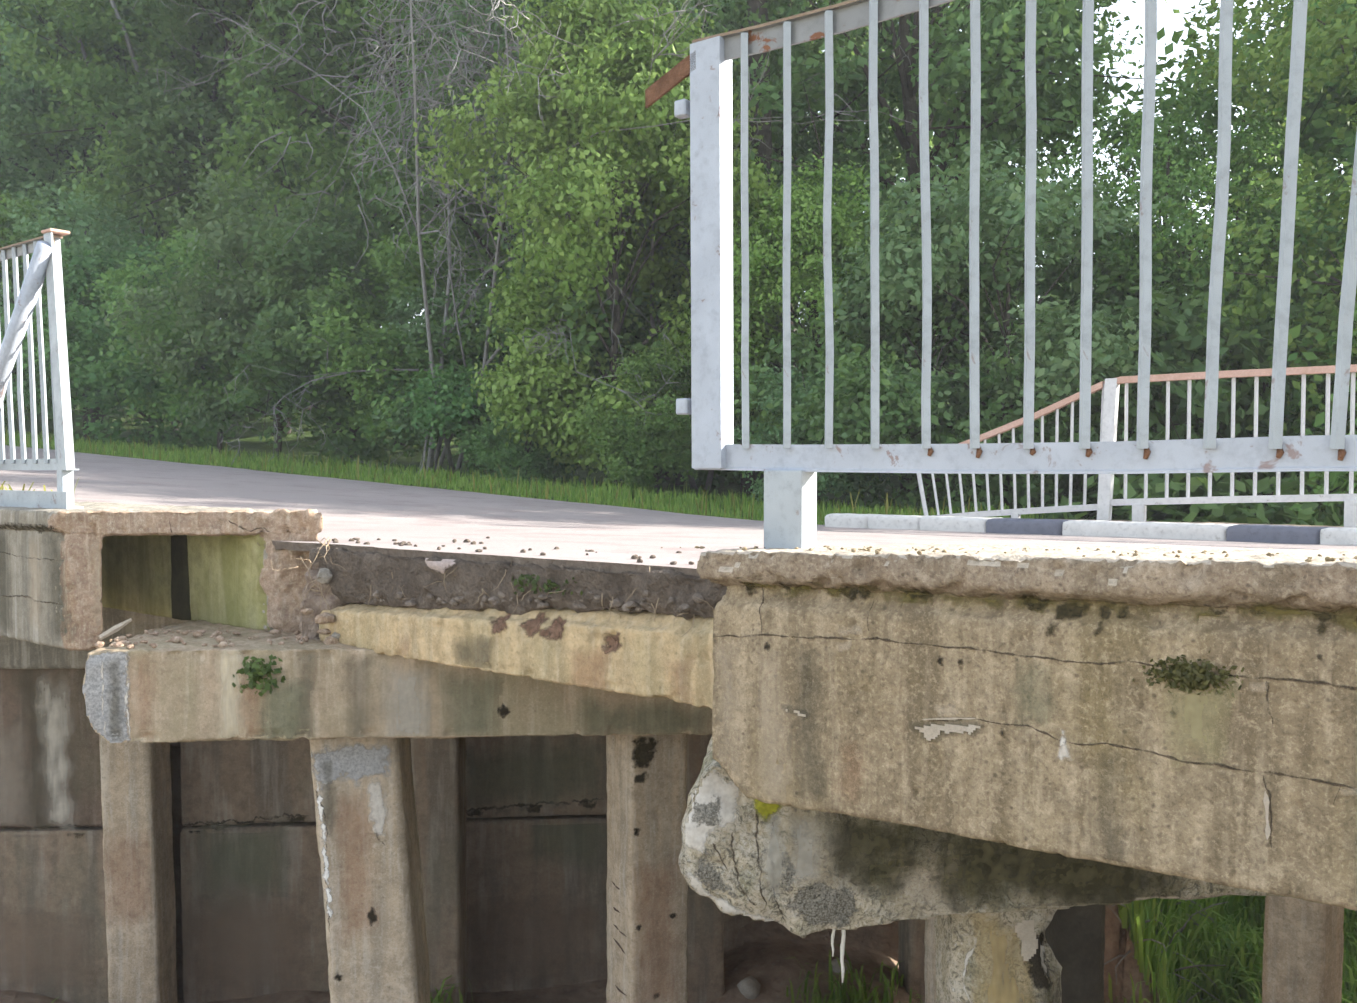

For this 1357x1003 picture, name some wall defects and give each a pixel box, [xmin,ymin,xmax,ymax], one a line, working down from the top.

spalling [492,612,566,640]
peeling [82,652,130,743]
spalling [915,718,980,741]
crack [1228,675,1357,724]
peeling [311,744,389,847]
crack [936,719,1357,848]